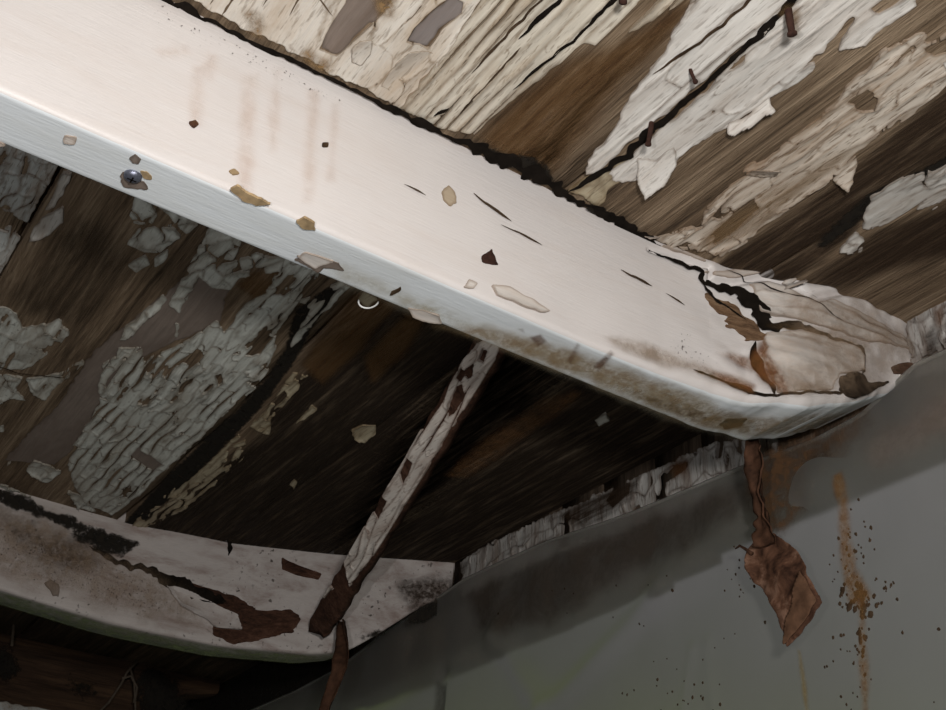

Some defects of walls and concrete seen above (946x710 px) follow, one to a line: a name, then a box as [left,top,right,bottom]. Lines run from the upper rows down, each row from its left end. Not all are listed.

peeling [194,0,640,134]
peeling [568,0,917,206]
peeling [0,141,350,527]
peeling [408,308,442,324]
peeling [441,185,457,206]
peeling [481,249,498,265]
crack [162,0,866,397]
peeling [491,284,550,313]
peeling [645,32,946,394]
peeling [351,424,376,443]
damp [0,489,160,609]
peeling [460,418,822,647]